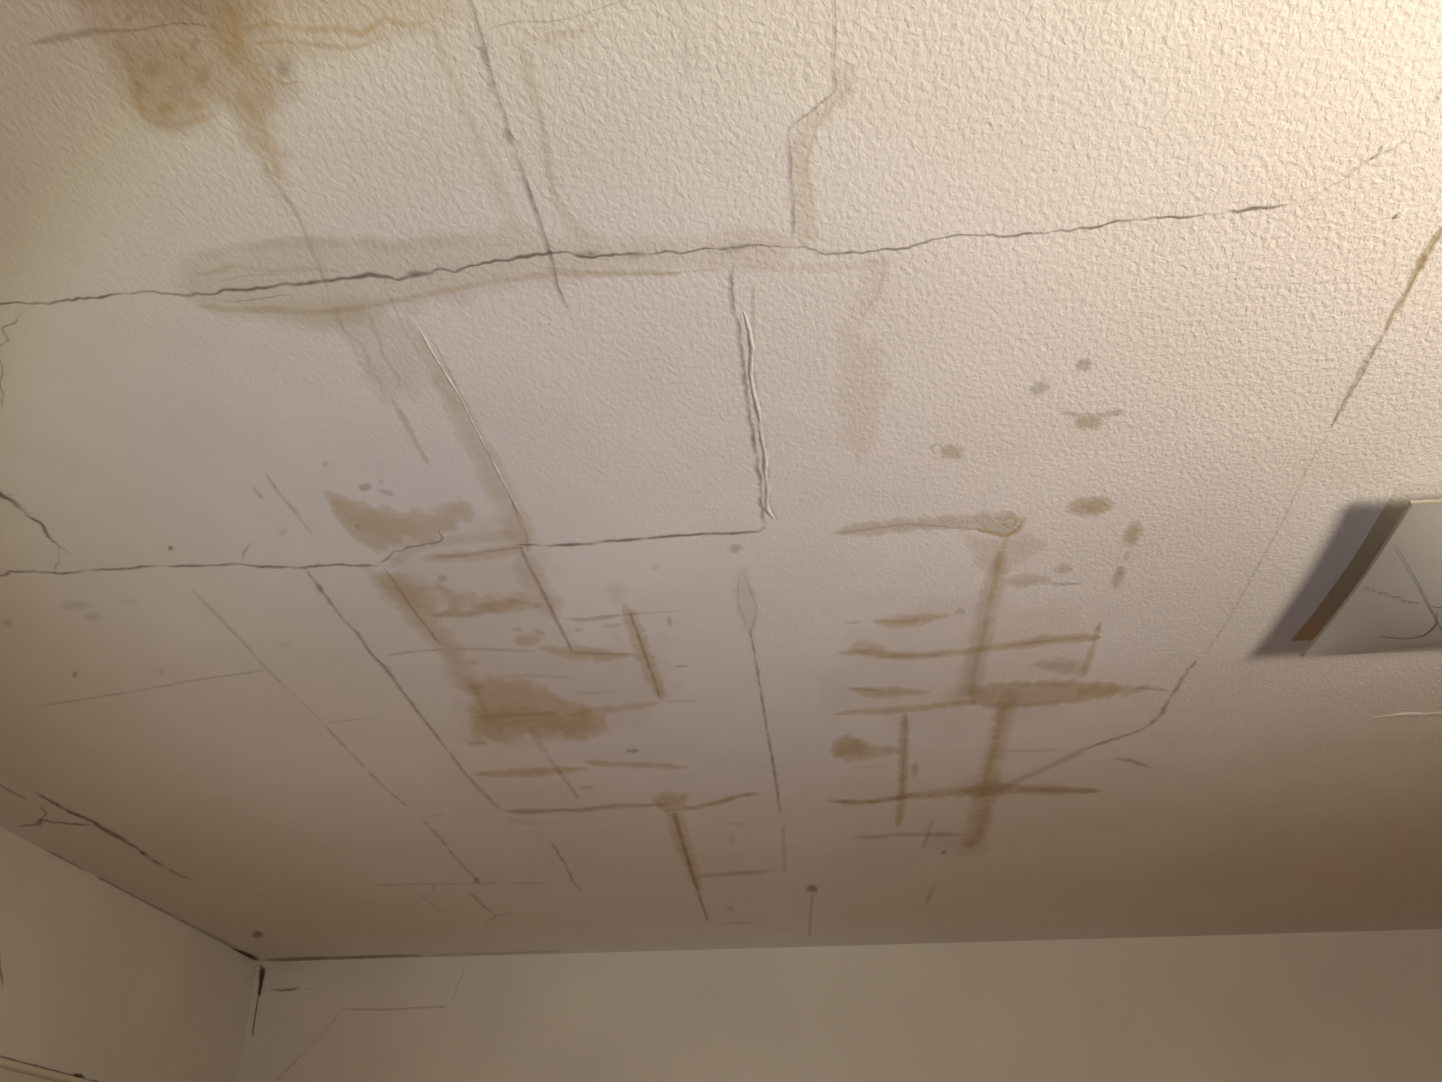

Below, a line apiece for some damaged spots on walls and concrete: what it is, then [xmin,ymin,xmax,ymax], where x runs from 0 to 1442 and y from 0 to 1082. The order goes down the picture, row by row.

crack [0,493,49,537]